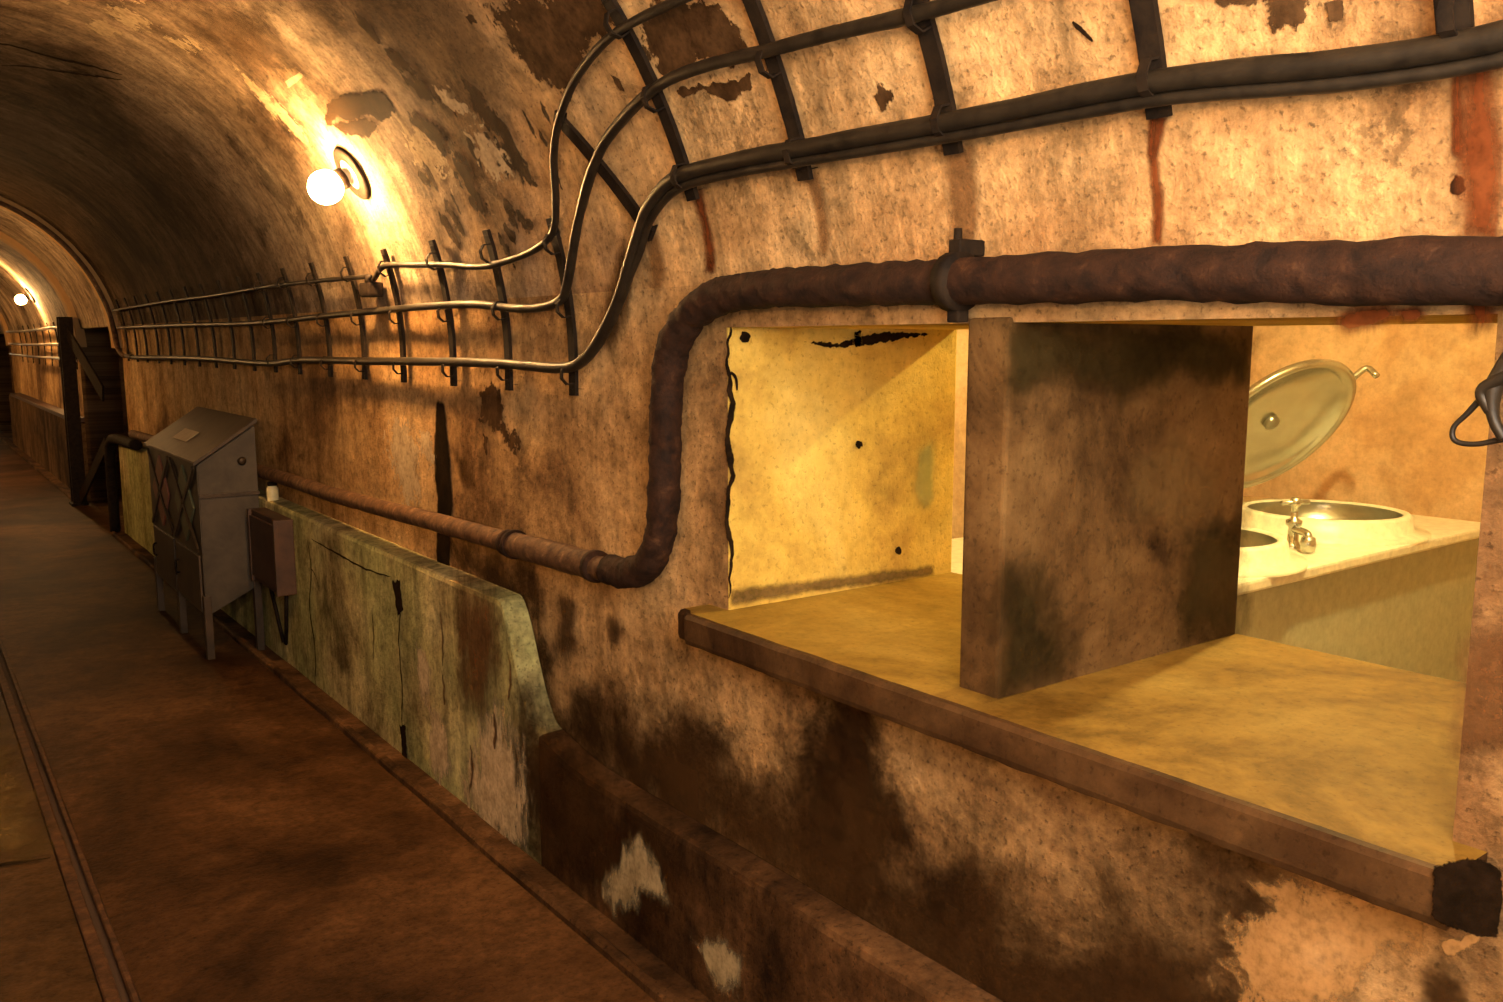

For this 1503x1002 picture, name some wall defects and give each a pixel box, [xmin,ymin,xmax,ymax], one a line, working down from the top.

spalling [466,0,622,152]
spalling [638,0,752,101]
spalling [1215,0,1344,34]
peeling [324,11,562,270]
rust [808,176,827,253]
rust [950,153,974,239]
rust [1148,117,1166,243]
rust [1453,70,1502,237]
rust [1335,305,1423,333]
leakage [450,537,1279,1002]
peeling [602,837,665,913]
peeling [1220,857,1503,1002]